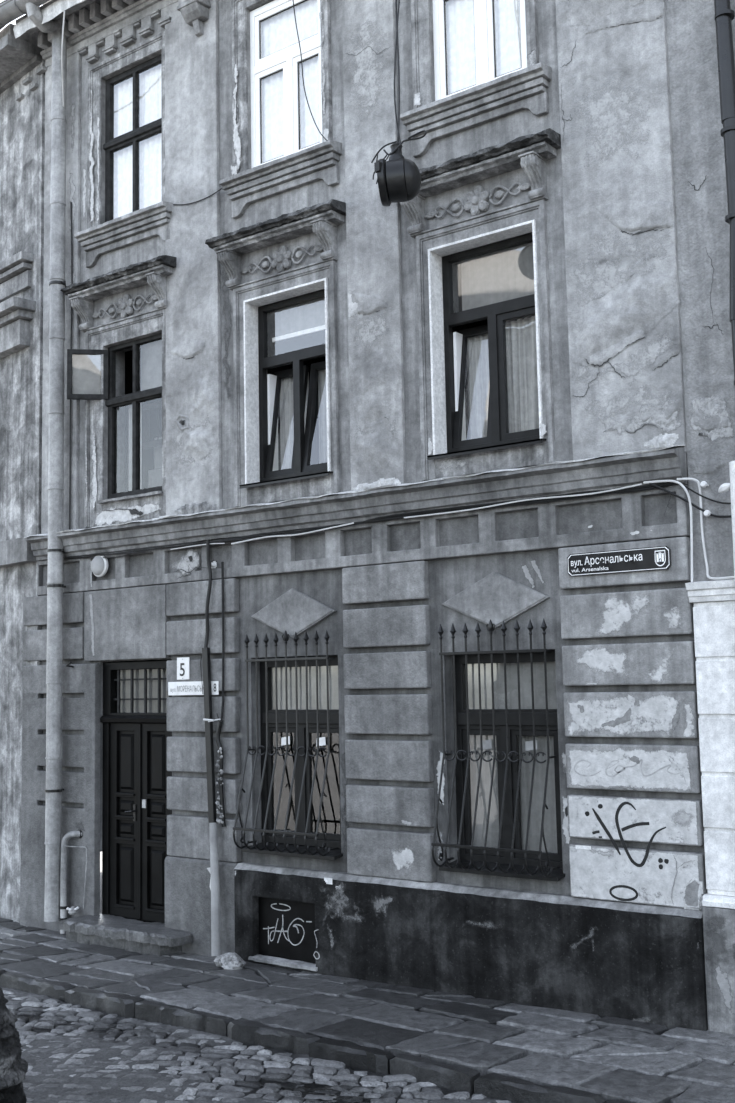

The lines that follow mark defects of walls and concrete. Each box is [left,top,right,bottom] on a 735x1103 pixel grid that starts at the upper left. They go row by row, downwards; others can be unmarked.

peeling [598,595,649,634]
peeling [664,607,681,628]
peeling [577,648,628,685]
peeling [648,653,671,682]
peeling [568,694,695,737]
peeling [562,748,703,910]
peeling [392,848,414,870]